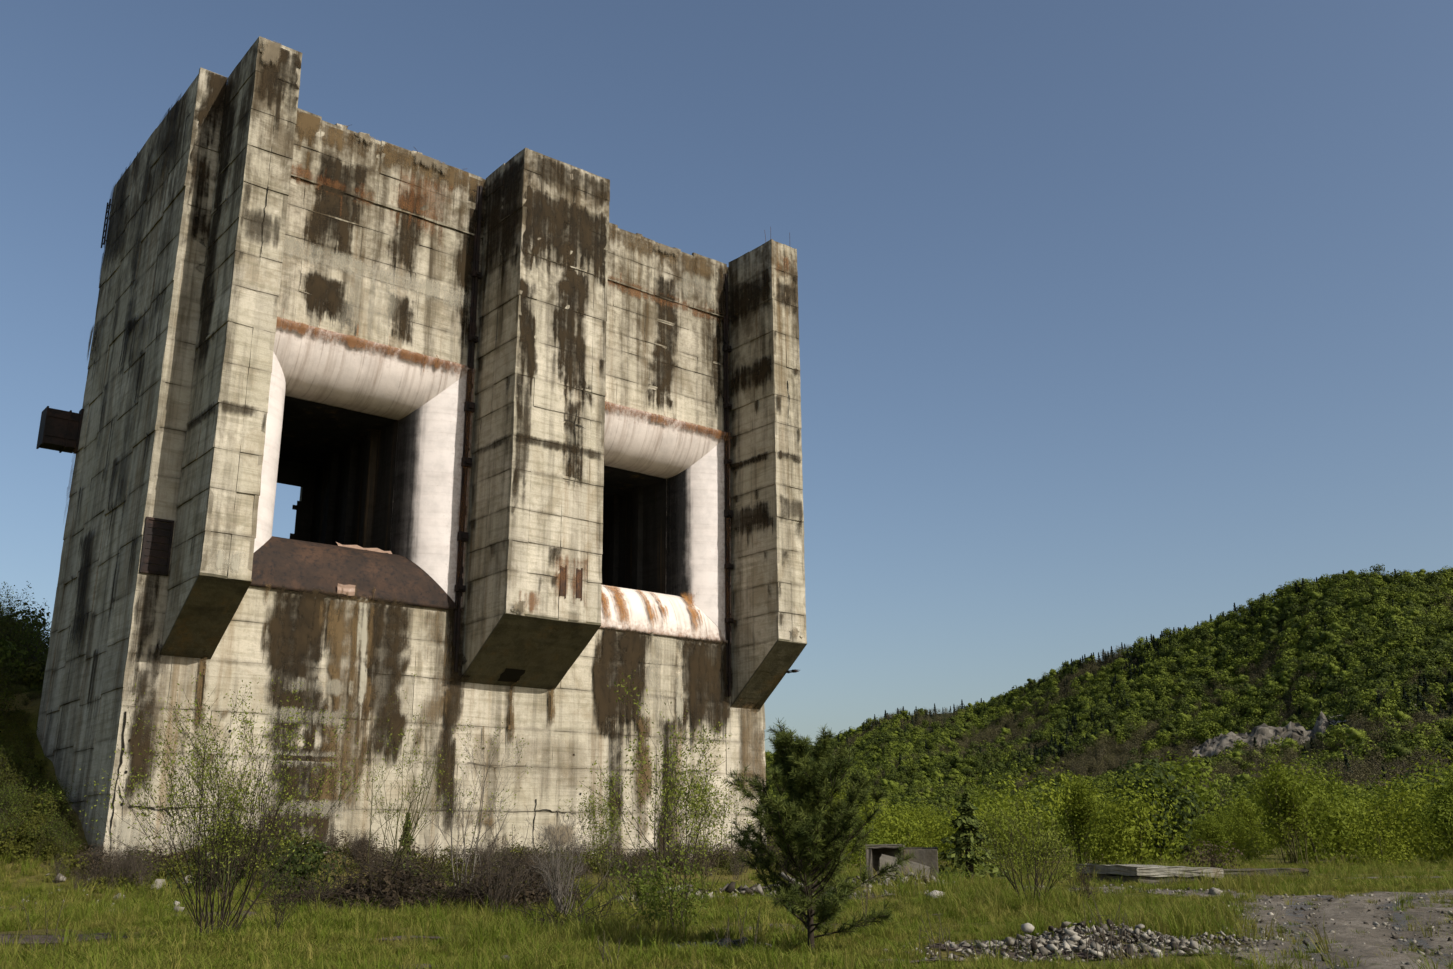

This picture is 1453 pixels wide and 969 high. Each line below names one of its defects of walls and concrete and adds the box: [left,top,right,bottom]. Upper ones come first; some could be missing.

damp [246,48,800,512]
rust [276,316,459,372]
damp [65,71,246,799]
damp [187,401,267,429]
damp [730,490,803,557]
damp [540,547,561,584]
rust [601,585,668,620]
rust [682,594,703,629]
damp [256,584,494,850]
damp [508,683,516,741]
damp [593,594,766,857]
damp [112,810,242,860]